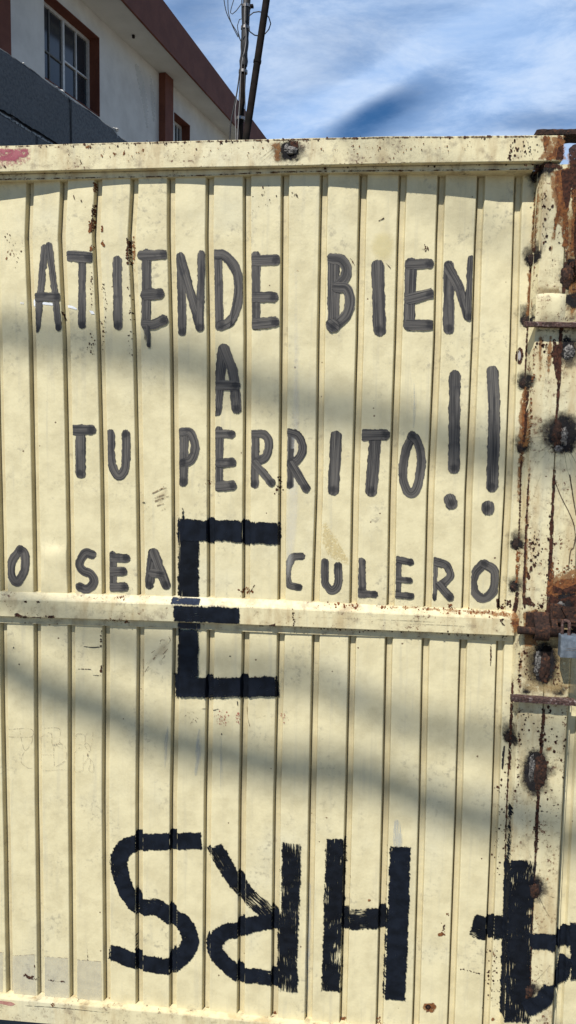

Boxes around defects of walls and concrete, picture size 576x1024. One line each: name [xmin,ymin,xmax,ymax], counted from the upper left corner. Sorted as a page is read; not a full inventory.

rust [1,135,576,314]
rust [376,267,576,883]